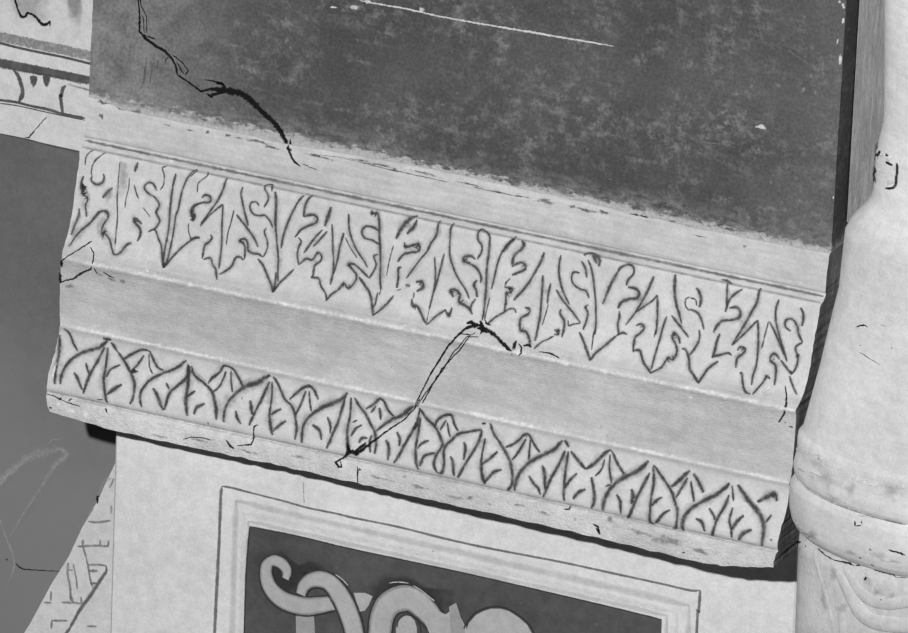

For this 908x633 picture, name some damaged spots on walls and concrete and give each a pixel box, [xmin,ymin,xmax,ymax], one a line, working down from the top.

crack [137,0,316,170]
spalling [873,142,897,189]
crack [59,241,115,283]
crack [334,320,559,483]